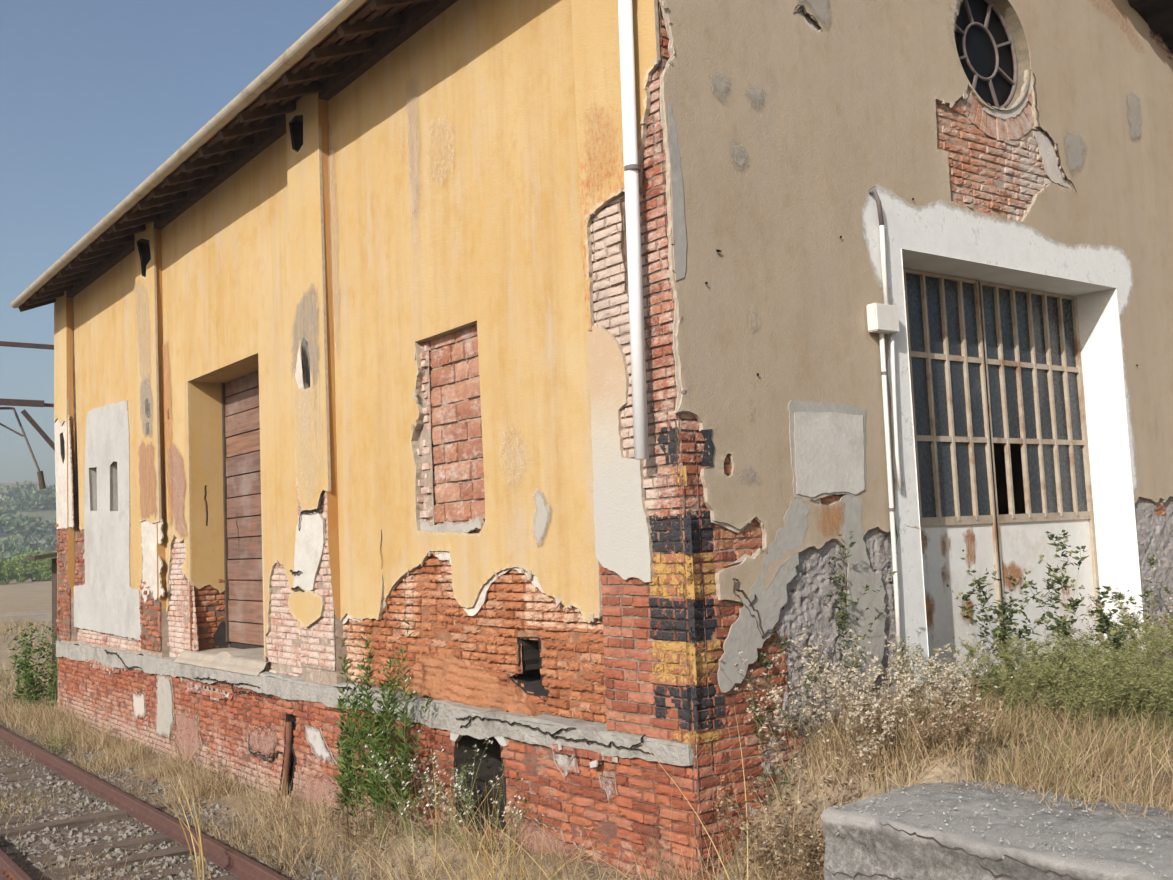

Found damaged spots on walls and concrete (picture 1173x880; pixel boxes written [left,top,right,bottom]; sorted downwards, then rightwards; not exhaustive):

spalling [793,5,822,31]
spalling [936,89,1072,221]
spalling [263,0,805,880]
spalling [820,494,846,505]
rust [966,530,975,561]
spalling [55,523,85,641]
rust [1002,563,1022,589]
rust [925,595,934,629]
crack [455,715,654,755]
crack [881,823,1080,880]
crack [824,867,903,880]